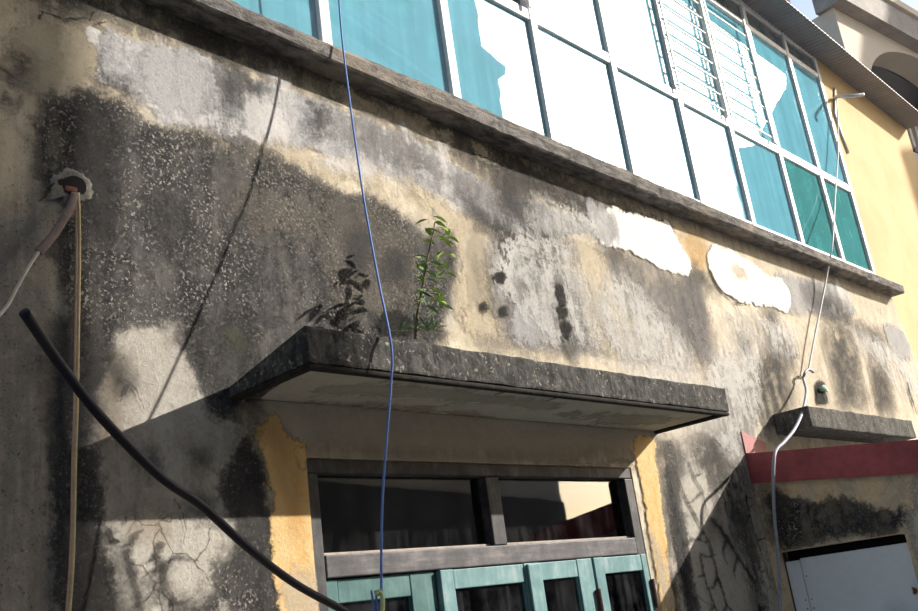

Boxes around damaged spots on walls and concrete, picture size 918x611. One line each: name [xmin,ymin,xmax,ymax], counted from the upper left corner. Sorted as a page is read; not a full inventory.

leakage [45,0,342,106]
peeling [10,19,693,369]
leakage [414,122,663,222]
leakage [27,85,457,611]
leakage [803,287,911,413]
crack [108,499,198,611]
leakage [655,439,700,611]
crack [679,462,769,611]
leakage [694,310,795,611]
flaking render [675,243,854,611]
leakage [764,488,909,551]